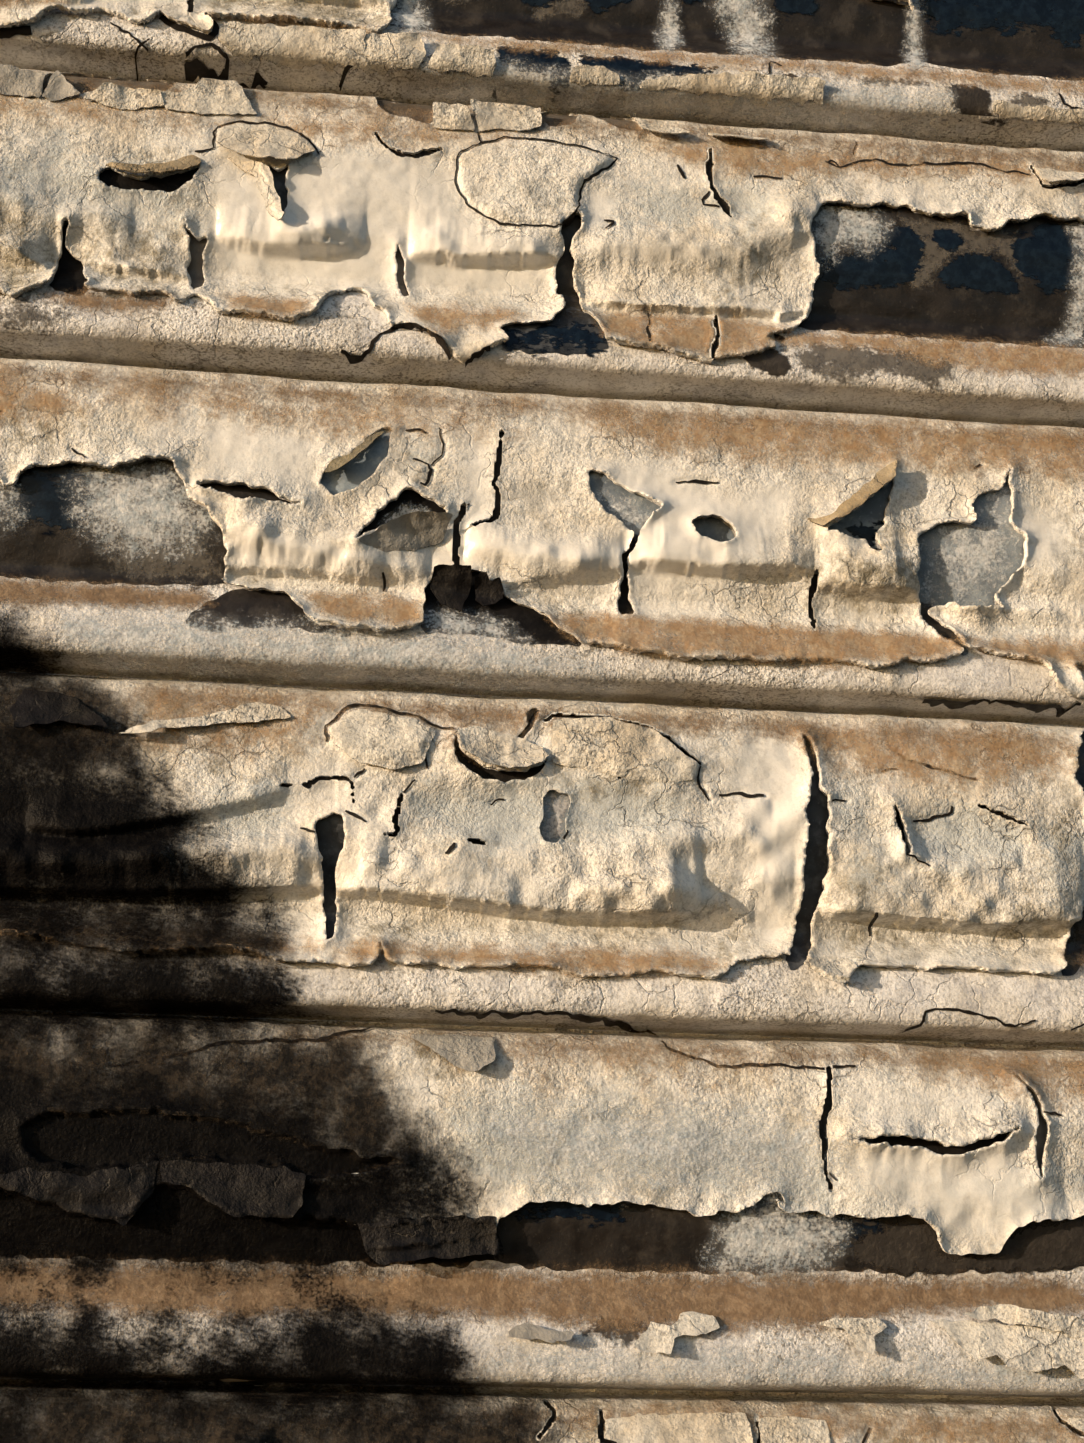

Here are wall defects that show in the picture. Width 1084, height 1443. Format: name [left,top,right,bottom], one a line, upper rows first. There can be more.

peeling [218,0,1084,110]
peeling [0,63,315,221]
peeling [798,203,1084,348]
peeling [0,459,351,637]
peeling [808,459,897,550]
peeling [917,475,1024,656]
water stain [0,578,1084,1443]
peeling [333,1192,1084,1283]
crack [537,1401,556,1439]
crack [597,1411,617,1443]
crack [754,1421,762,1443]
crack [1053,1410,1084,1437]